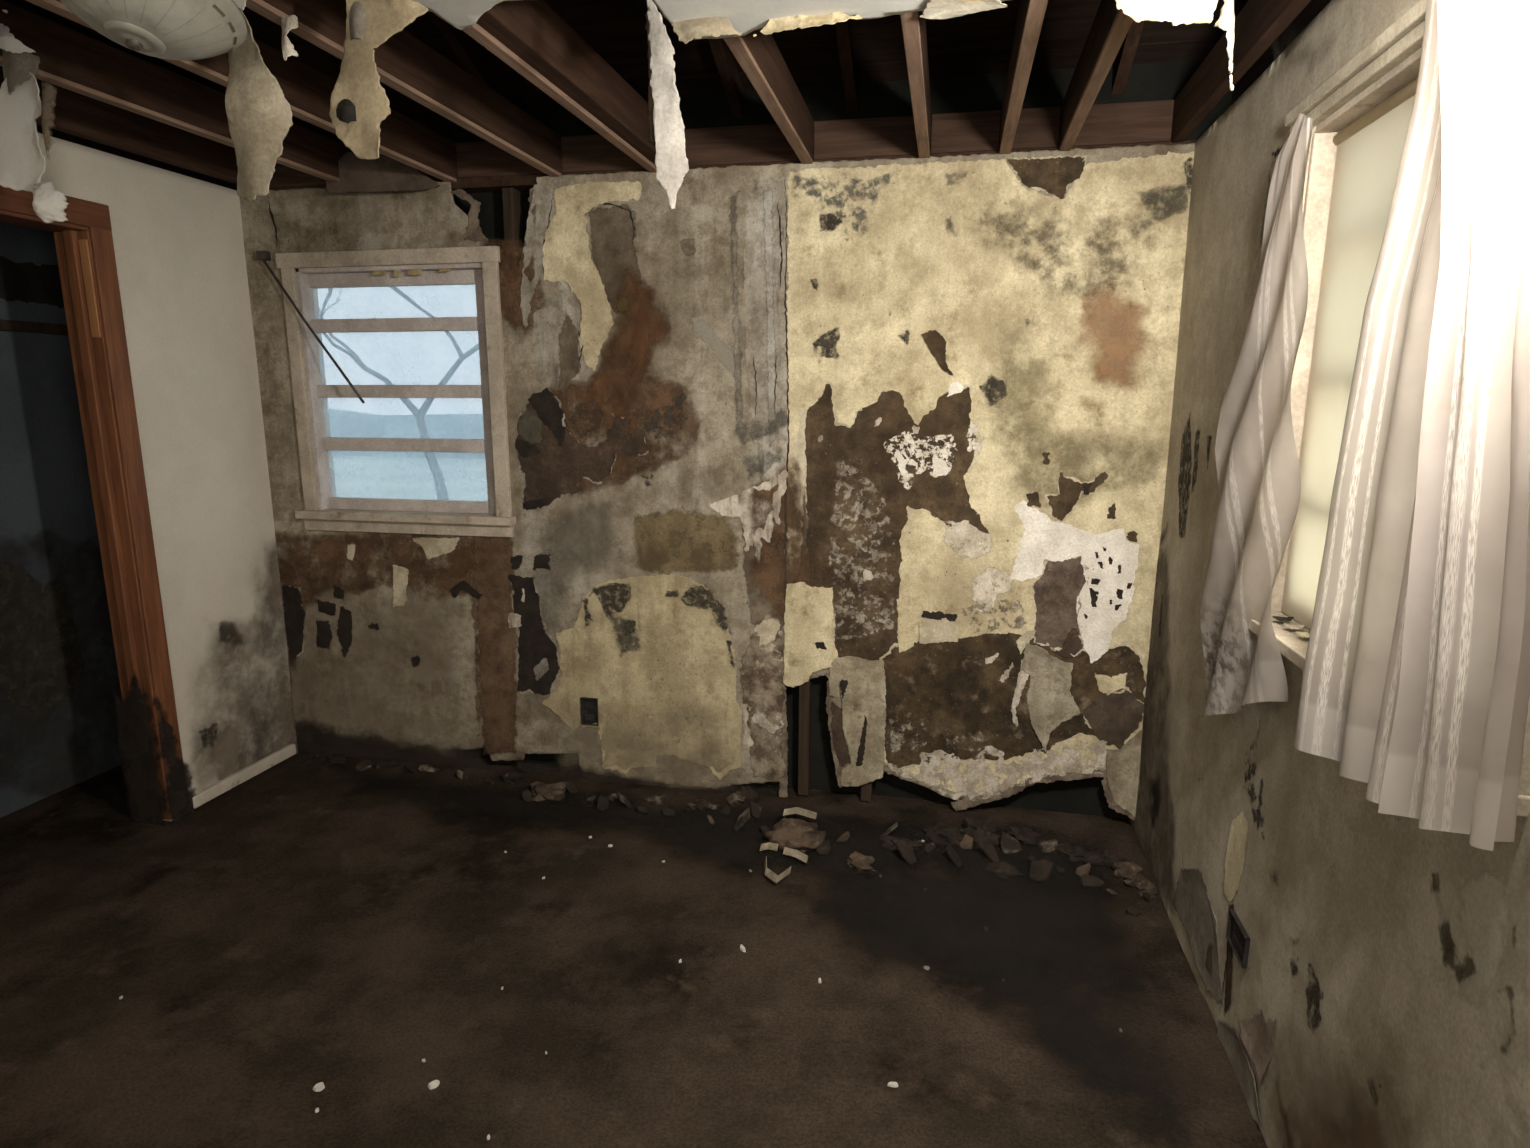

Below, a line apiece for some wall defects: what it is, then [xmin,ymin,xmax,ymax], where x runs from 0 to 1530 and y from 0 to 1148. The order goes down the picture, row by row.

mould [794,174,890,240]
spalling [1006,155,1087,199]
water stain [1132,158,1193,235]
flaking render [515,181,649,510]
rust [575,273,670,431]
water stain [813,327,840,358]
flaking render [709,178,1146,821]
water stain [980,362,1153,494]
spalling [282,585,379,661]
flaking render [508,554,560,697]
water stain [0,532,1183,1133]
peeling [1173,811,1277,1127]